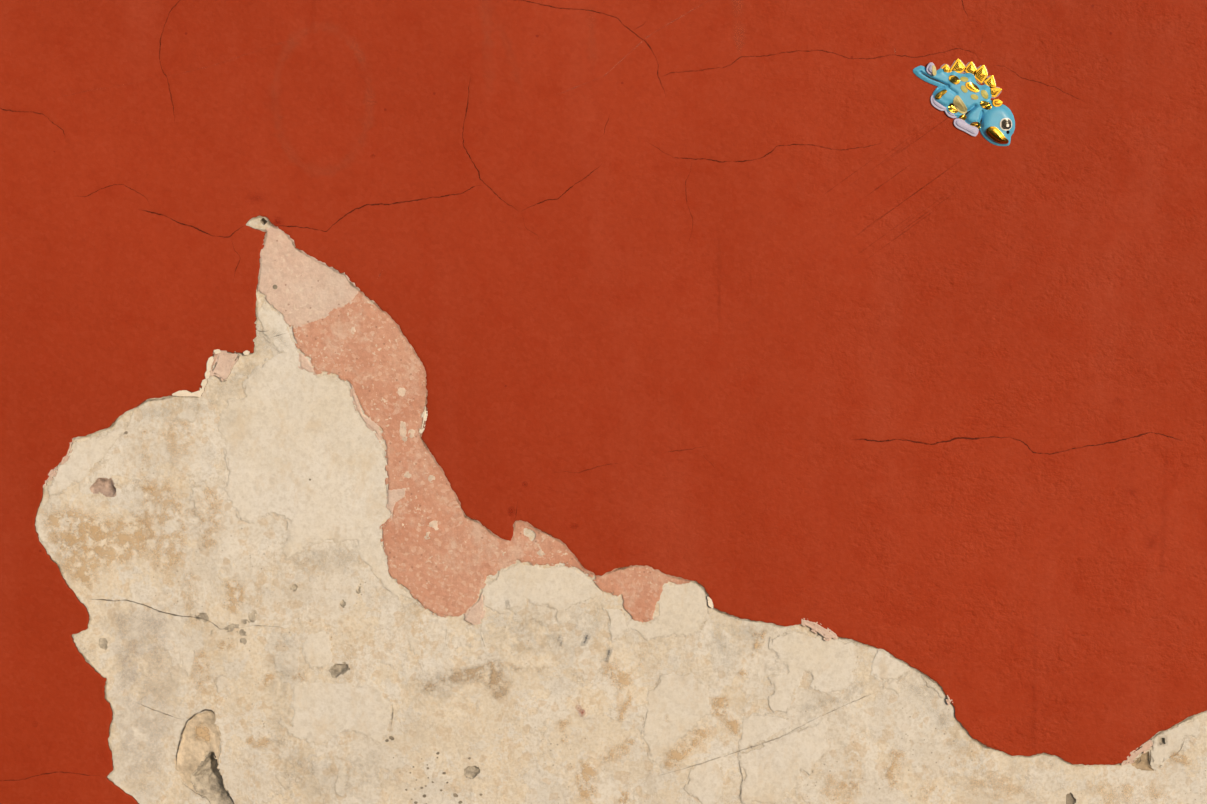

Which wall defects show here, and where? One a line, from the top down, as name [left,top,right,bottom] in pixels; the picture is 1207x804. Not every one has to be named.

crack [286,87,596,232]
crack [683,144,803,162]
crack [81,184,240,269]
crack [860,432,1175,455]
peeling [35,216,1207,804]